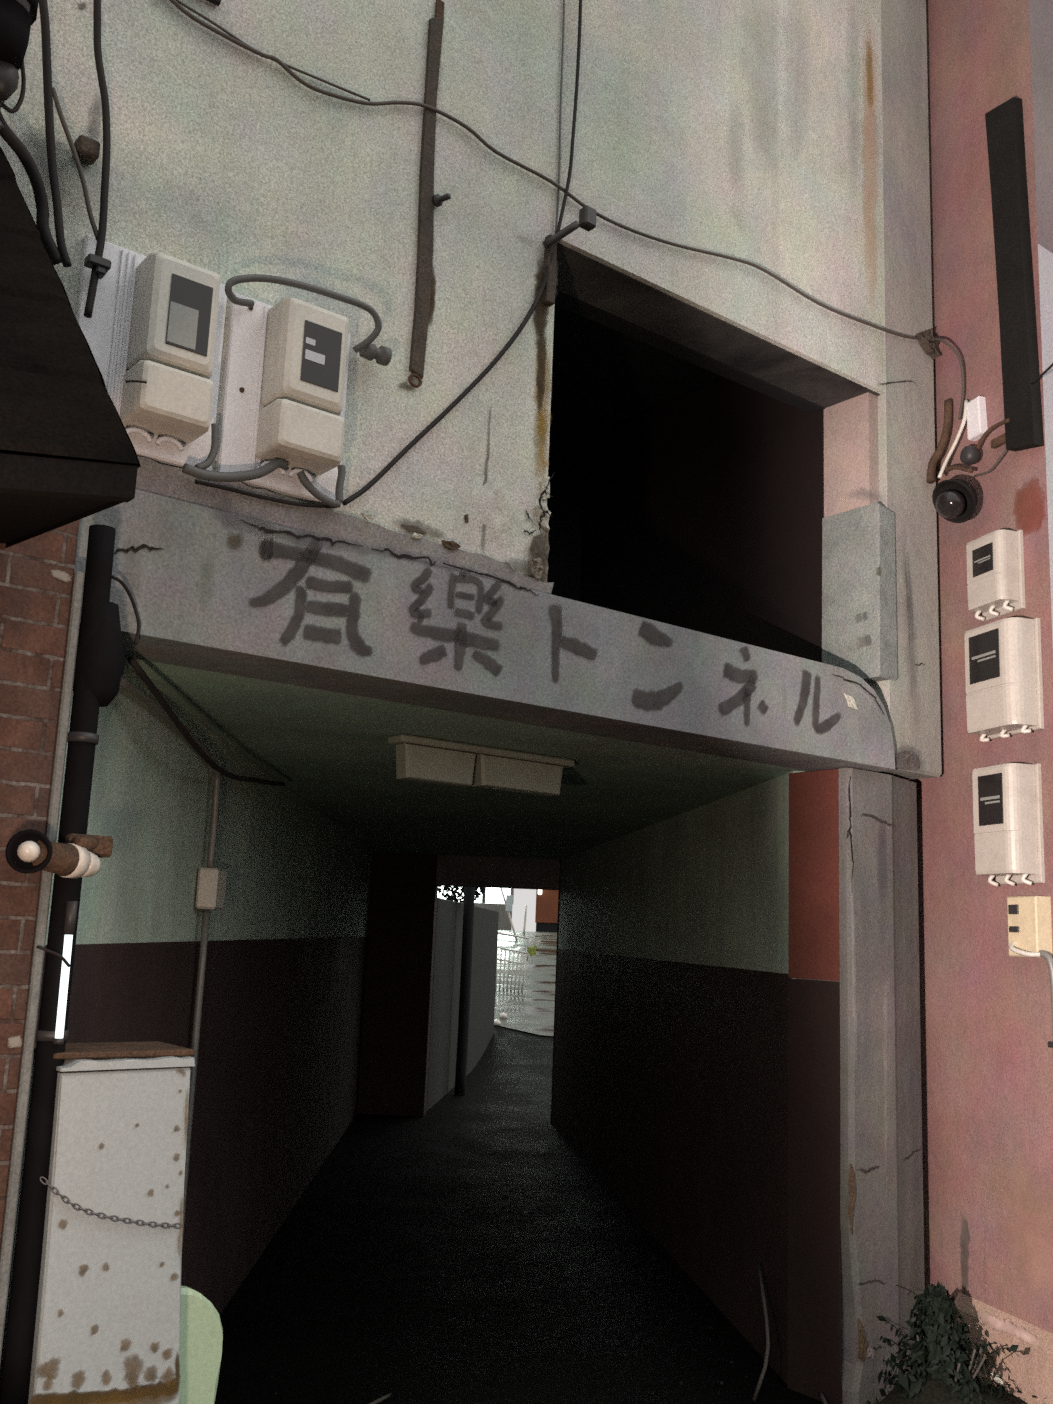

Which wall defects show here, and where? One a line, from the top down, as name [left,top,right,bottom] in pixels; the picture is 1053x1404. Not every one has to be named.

rust [534,261,557,464]
flaking render [401,520,461,550]
spalling [510,477,551,583]